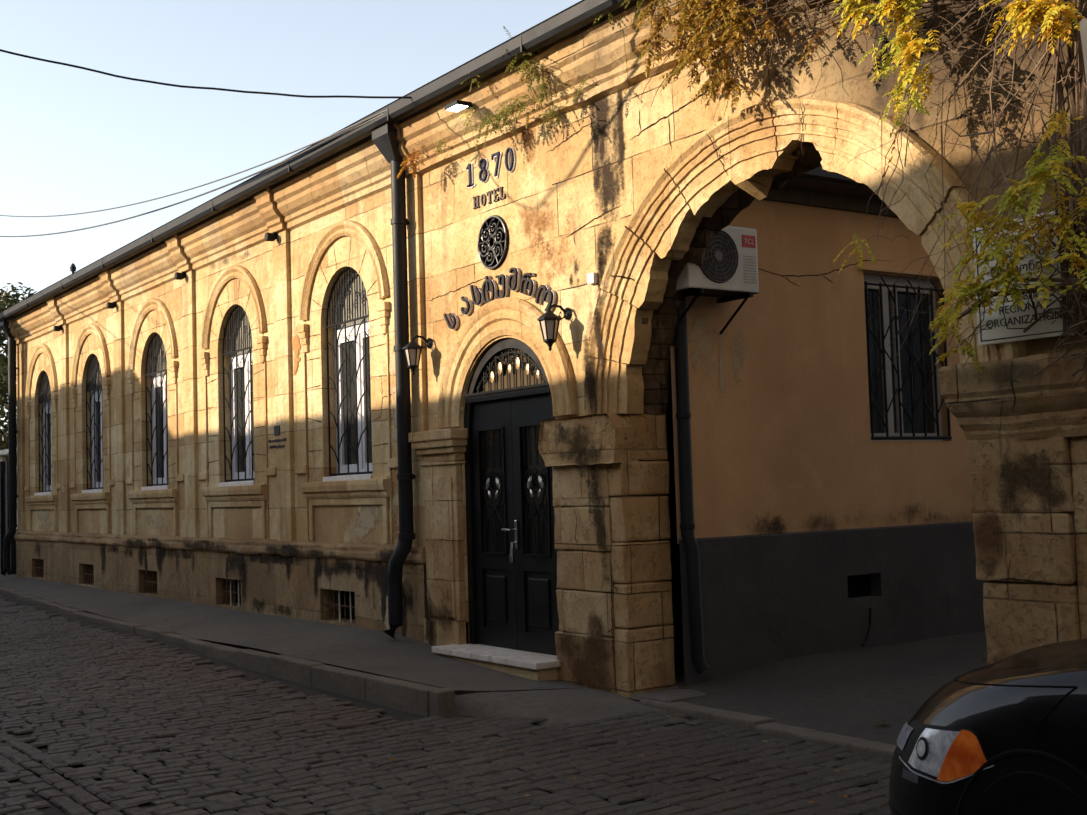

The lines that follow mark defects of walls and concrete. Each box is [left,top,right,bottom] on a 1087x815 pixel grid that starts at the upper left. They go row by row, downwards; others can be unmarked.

water stain [584,90,624,414]
water stain [587,465,610,581]
water stain [998,450,1066,516]
water stain [100,538,394,621]
water stain [402,578,451,645]
water stain [557,615,610,692]